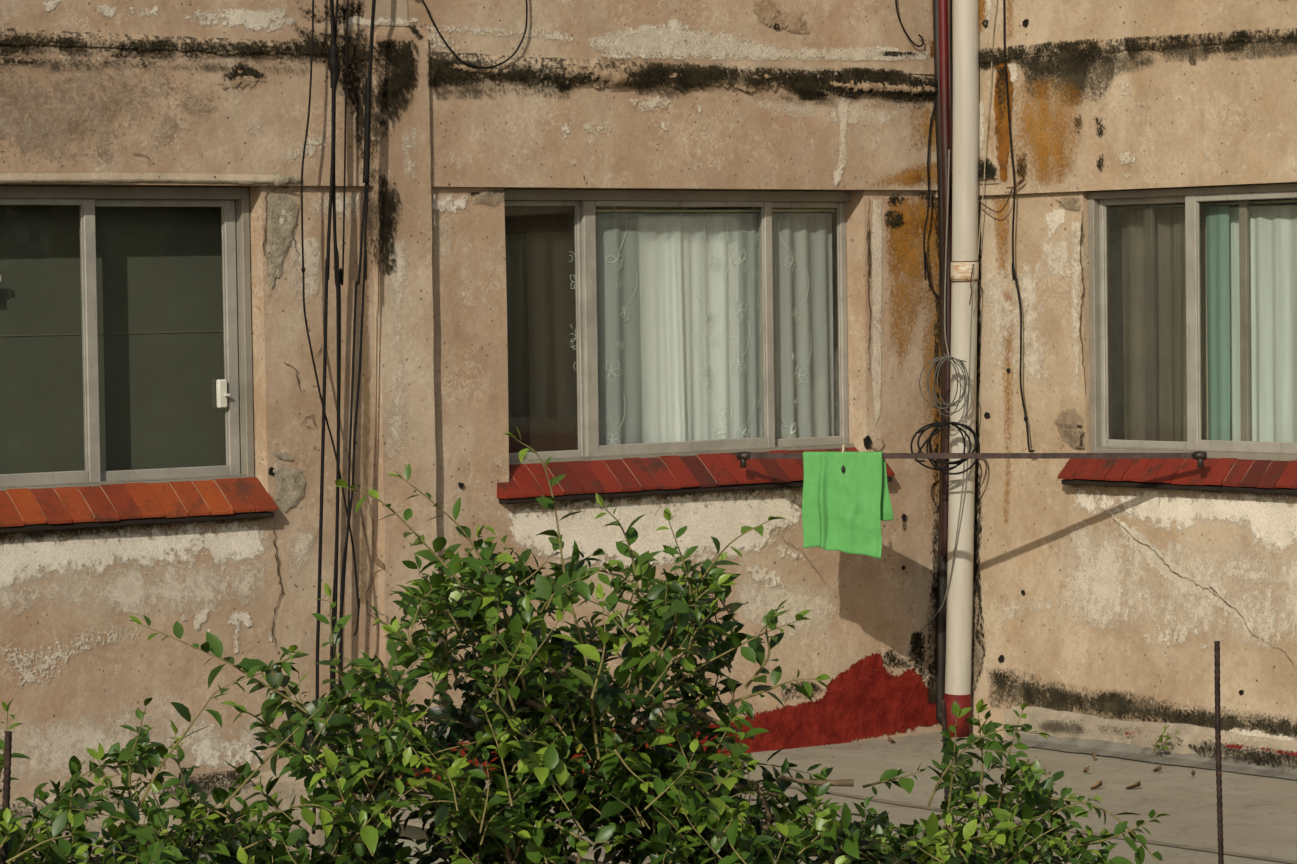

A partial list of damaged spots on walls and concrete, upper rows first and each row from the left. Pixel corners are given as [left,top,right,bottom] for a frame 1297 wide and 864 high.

leakage [0,1,938,275]
leakage [979,159,996,182]
leakage [978,28,1297,137]
corrosion [882,110,941,528]
peeling [986,196,1082,388]
peeling [0,521,268,653]
crack [271,530,284,651]
peeling [508,489,836,636]
leakage [883,192,941,704]
leakage [971,199,1297,769]
peeling [1003,489,1297,864]
crack [1102,509,1297,669]